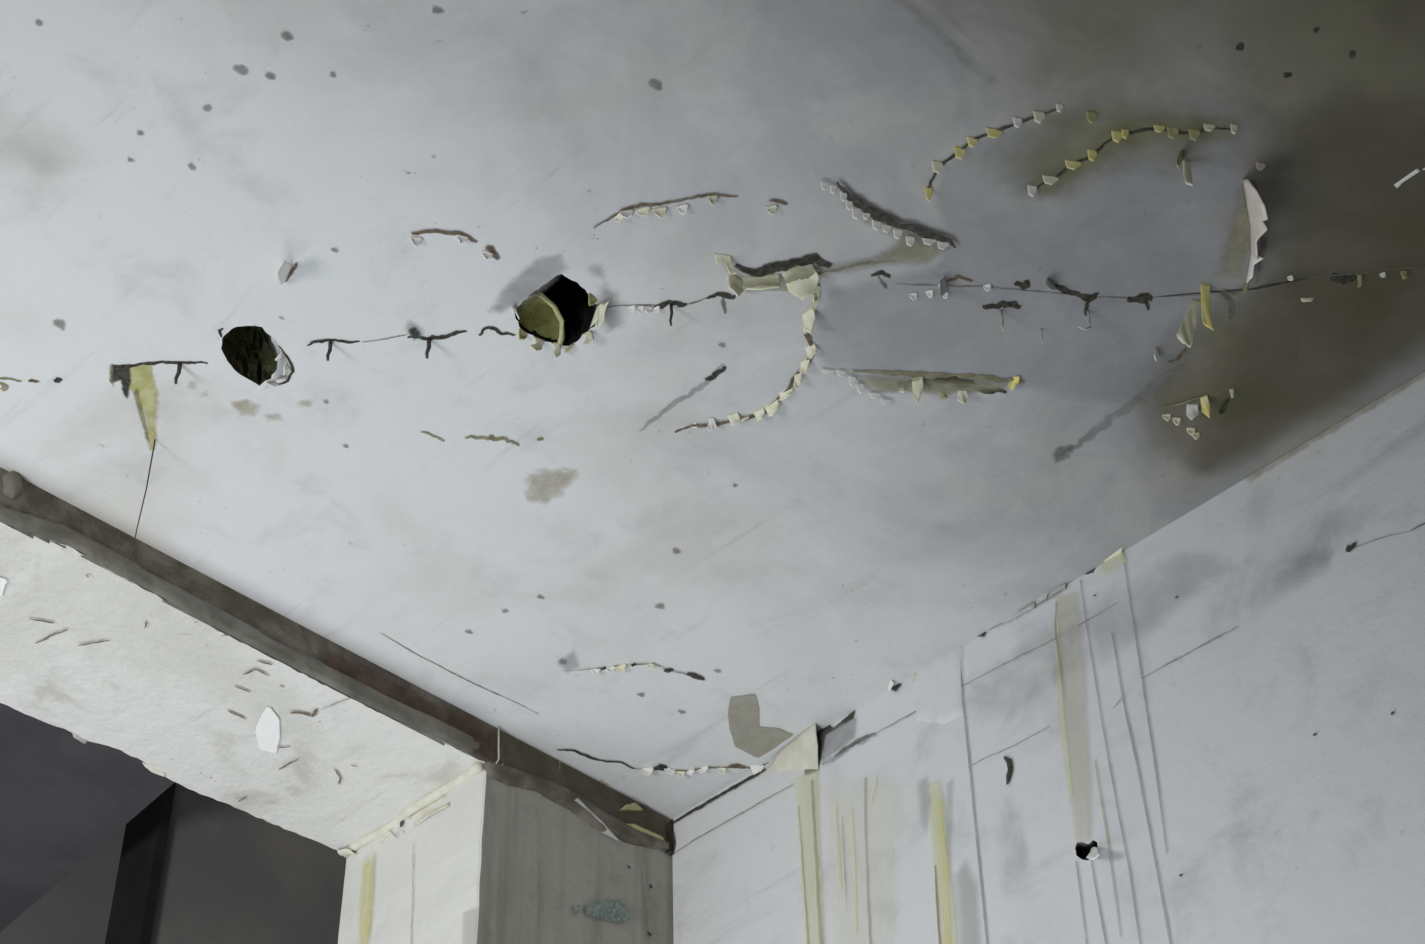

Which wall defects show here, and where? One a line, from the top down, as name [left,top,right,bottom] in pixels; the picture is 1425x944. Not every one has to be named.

water stain [1040,0,1425,459]
crack [112,360,208,368]
spalling [218,326,295,387]
crack [307,326,515,346]
spalling [511,274,609,358]
crack [607,288,736,315]
peeling [674,182,1025,433]
crack [818,261,1424,321]
peeling [557,710,855,786]
water stain [1111,550,1171,944]
water stain [797,774,823,944]
water stain [930,784,956,944]